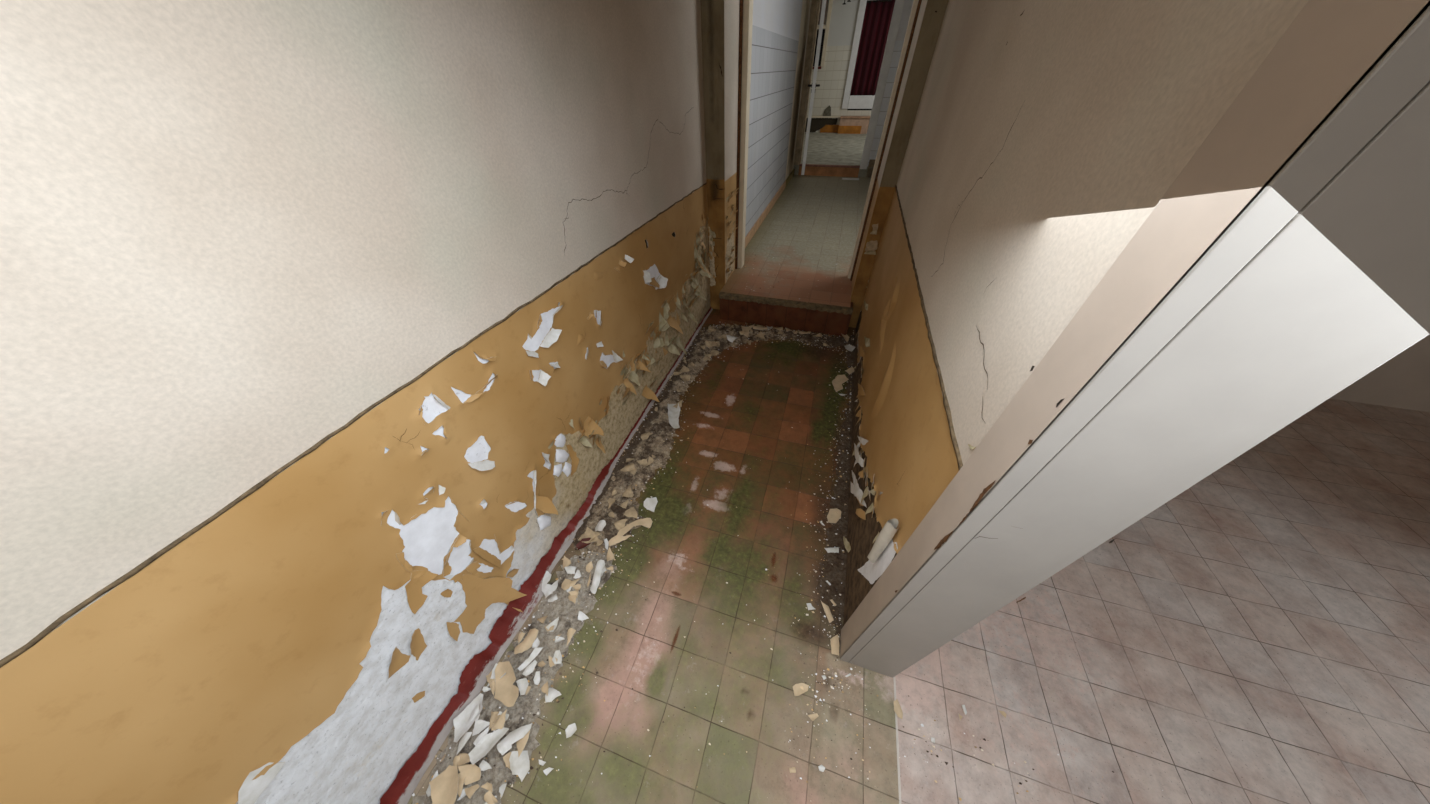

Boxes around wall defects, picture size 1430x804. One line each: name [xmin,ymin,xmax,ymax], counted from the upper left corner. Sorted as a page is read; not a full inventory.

crack [563,107,694,255]
peeling [236,187,740,804]